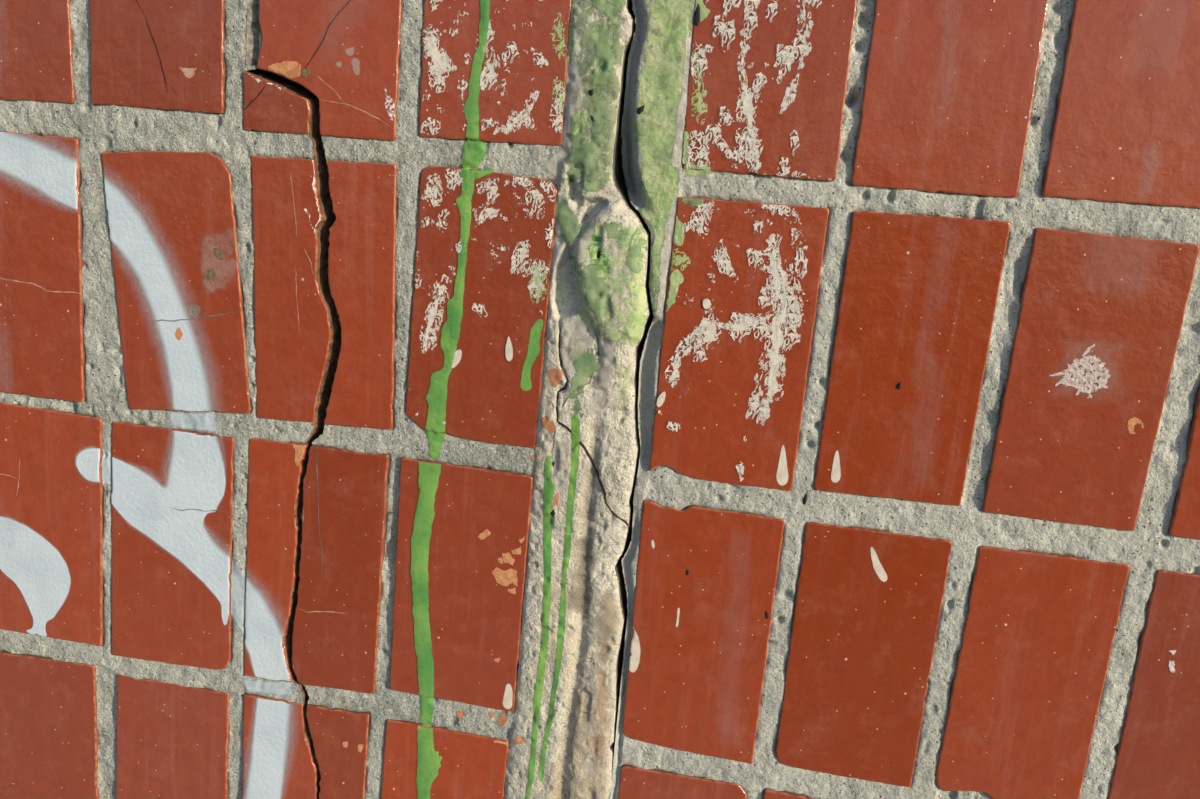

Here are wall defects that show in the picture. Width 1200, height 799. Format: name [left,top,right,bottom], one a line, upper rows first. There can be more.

crack [245,0,392,799]
crack [551,0,654,799]